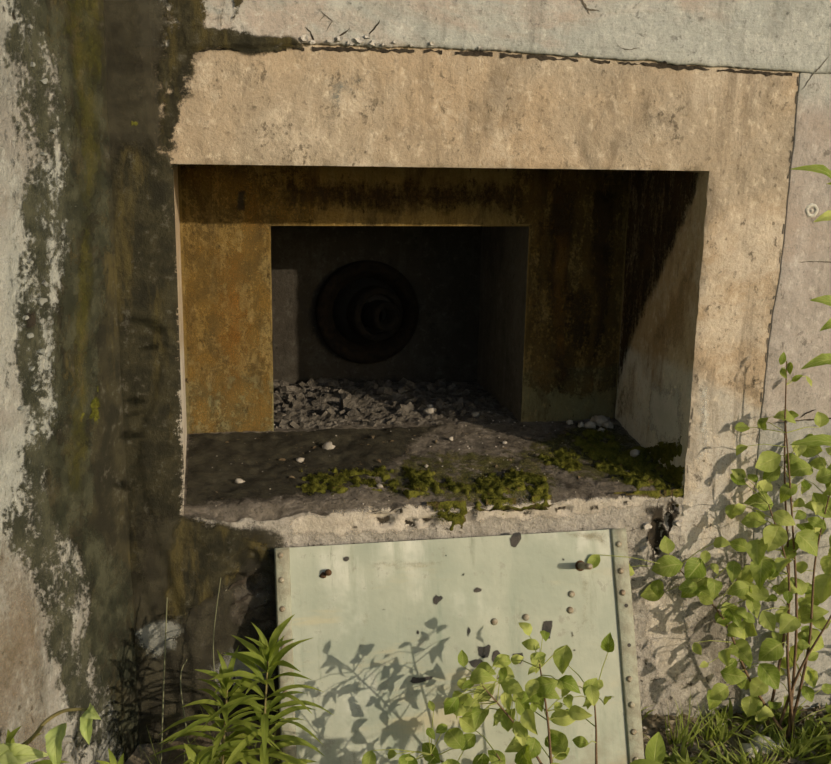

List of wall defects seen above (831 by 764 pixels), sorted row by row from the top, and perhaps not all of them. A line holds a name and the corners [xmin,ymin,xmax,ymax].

leakage [0,0,445,764]
crack [755,410,831,465]
spalling [290,492,684,564]